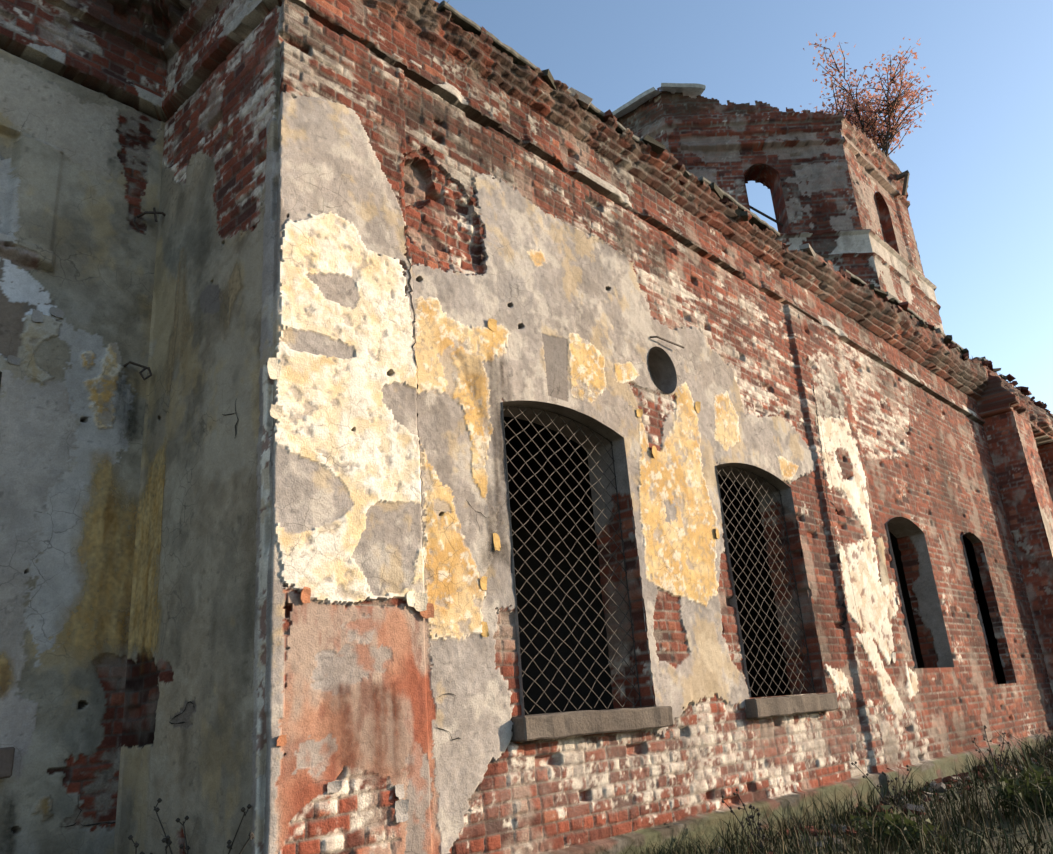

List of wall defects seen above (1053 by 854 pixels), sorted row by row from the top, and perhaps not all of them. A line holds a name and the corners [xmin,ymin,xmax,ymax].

peeling [0,240,139,666]
peeling [116,0,930,854]
spalling [33,648,174,831]
damp [339,687,356,770]
damp [372,685,400,759]